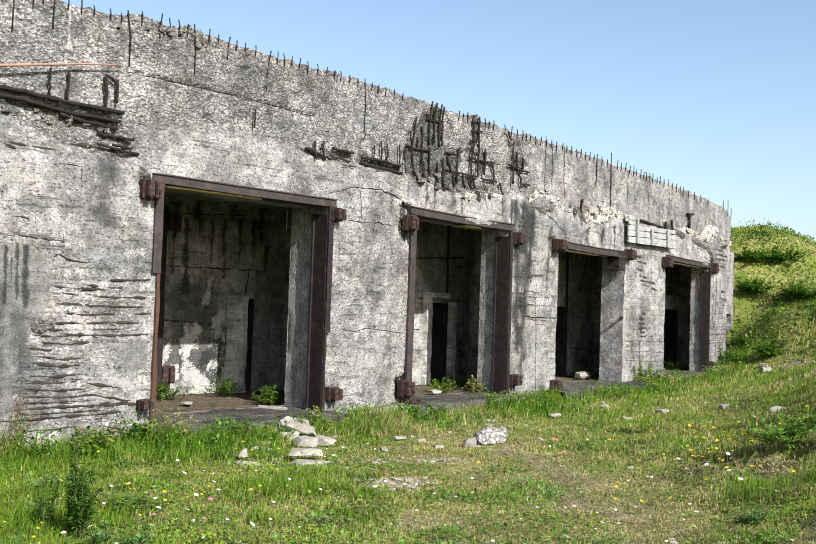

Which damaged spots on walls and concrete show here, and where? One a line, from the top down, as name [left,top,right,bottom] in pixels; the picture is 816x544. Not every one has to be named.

spalling [297,101,504,213]
spalling [506,131,629,228]
spalling [398,203,408,243]
spalling [640,213,731,268]
water stain [0,242,30,411]
peeling [162,308,226,393]
peeling [202,275,214,307]